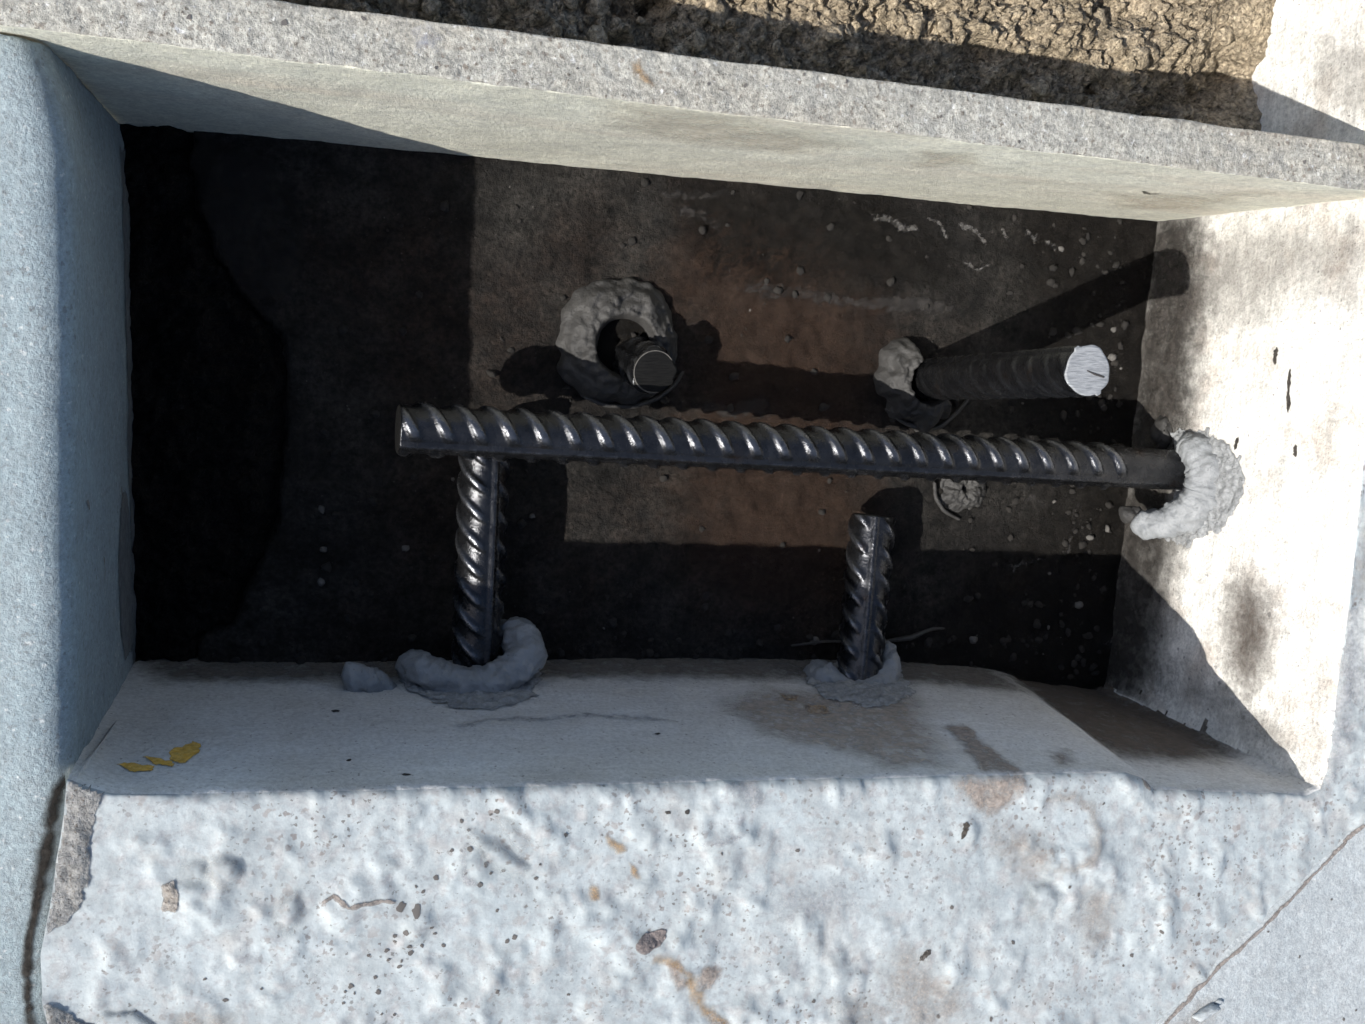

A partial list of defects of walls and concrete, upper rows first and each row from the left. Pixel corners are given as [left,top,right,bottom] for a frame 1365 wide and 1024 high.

peeling [119,492,133,659]
leakage [1231,587,1267,677]
rust [660,960,725,1024]
crack [1164,824,1365,1024]